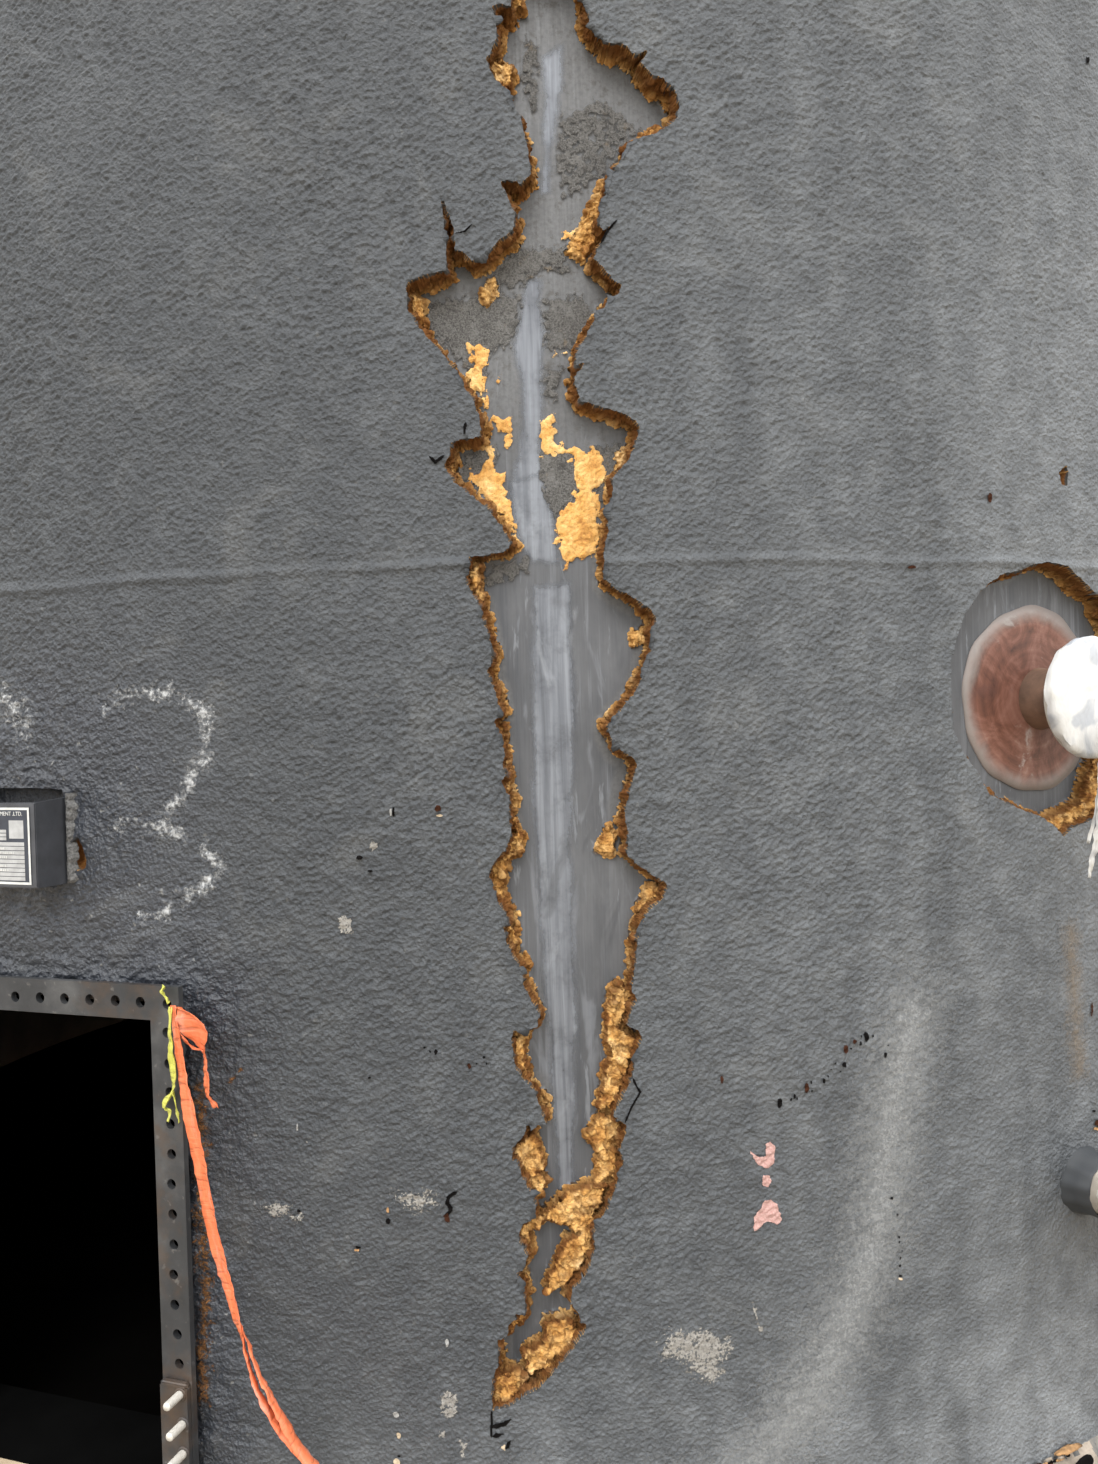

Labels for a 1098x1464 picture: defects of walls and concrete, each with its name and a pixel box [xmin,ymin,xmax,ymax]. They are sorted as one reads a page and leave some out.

spalling [421,0,667,1361]
spalling [950,562,1098,836]